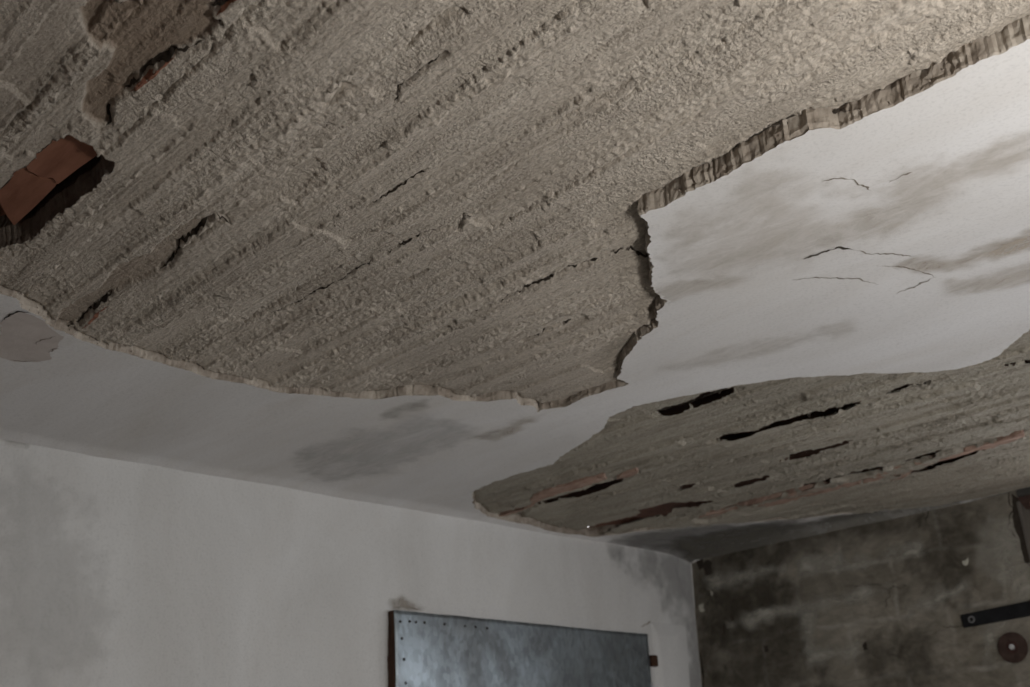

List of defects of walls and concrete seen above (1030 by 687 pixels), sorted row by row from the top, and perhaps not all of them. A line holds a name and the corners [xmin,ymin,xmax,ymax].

flaking render [0,0,1030,412]
crack [798,246,935,293]
crack [822,172,912,190]
crack [651,388,727,415]
flaking render [471,330,1030,563]
leakage [629,490,1030,687]